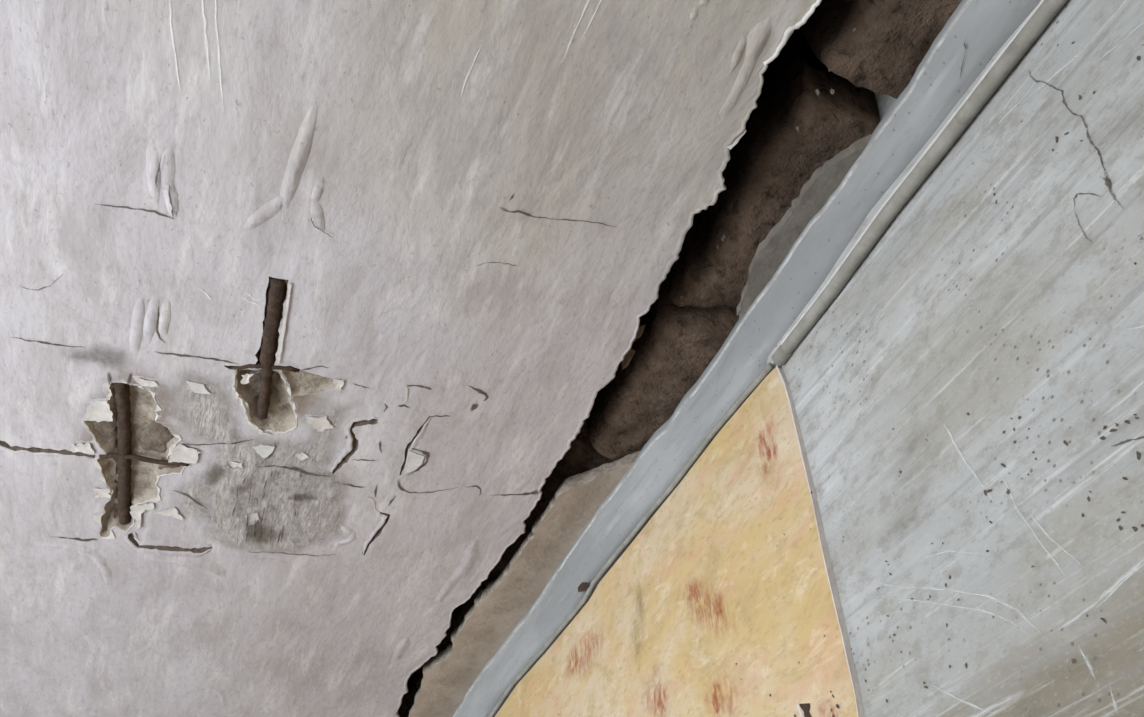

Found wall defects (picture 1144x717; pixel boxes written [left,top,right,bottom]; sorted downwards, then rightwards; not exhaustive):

crack [999,78,1116,239]
crack [103,205,171,218]
crack [18,338,81,347]
crack [330,0,977,717]
flaking render [70,277,344,551]
crack [0,441,96,459]
crack [58,535,96,543]
crack [125,532,213,558]